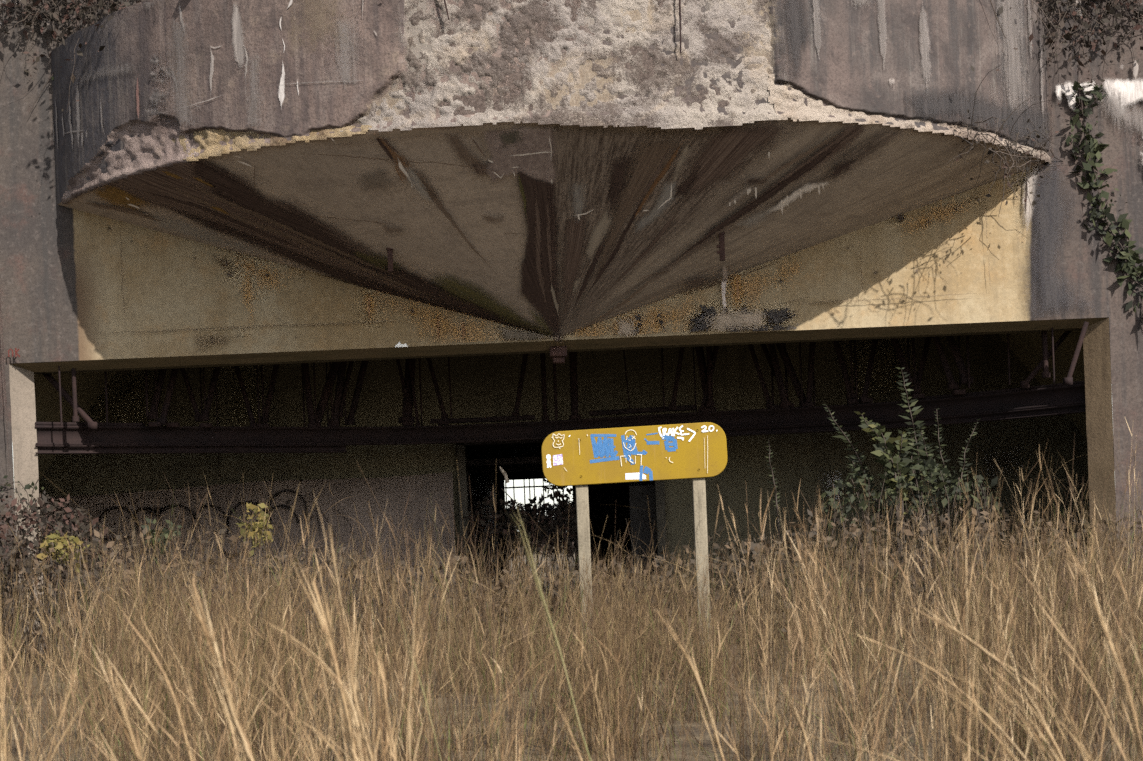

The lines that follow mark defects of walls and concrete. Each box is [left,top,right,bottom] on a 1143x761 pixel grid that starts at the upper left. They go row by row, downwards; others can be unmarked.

damp [209,5,260,124]
efflorescence [278,0,299,107]
spalling [61,0,1052,204]